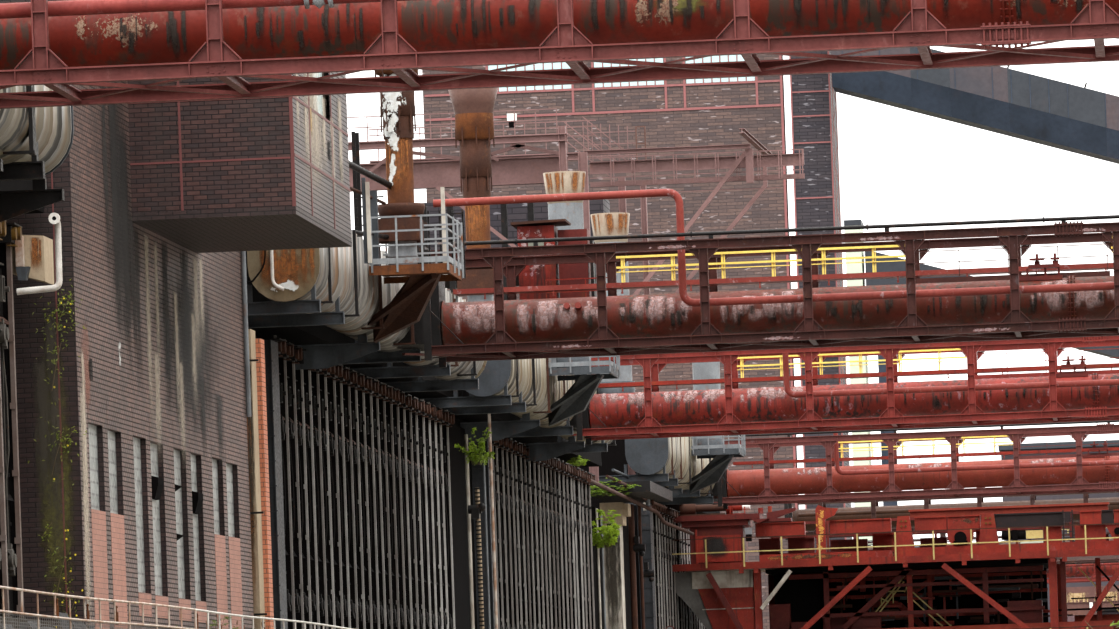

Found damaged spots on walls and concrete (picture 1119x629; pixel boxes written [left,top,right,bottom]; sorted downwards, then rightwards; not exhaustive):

peeling [635,0,702,26]
peeling [75,13,159,48]
peeling [382,92,406,186]
rust [545,172,585,191]
rust [465,197,487,237]
rust [592,214,628,231]
damp [102,104,223,448]
peeling [453,304,495,331]
peeling [517,300,598,330]
peeling [620,296,692,320]
peeling [720,291,804,319]
damp [247,365,255,569]